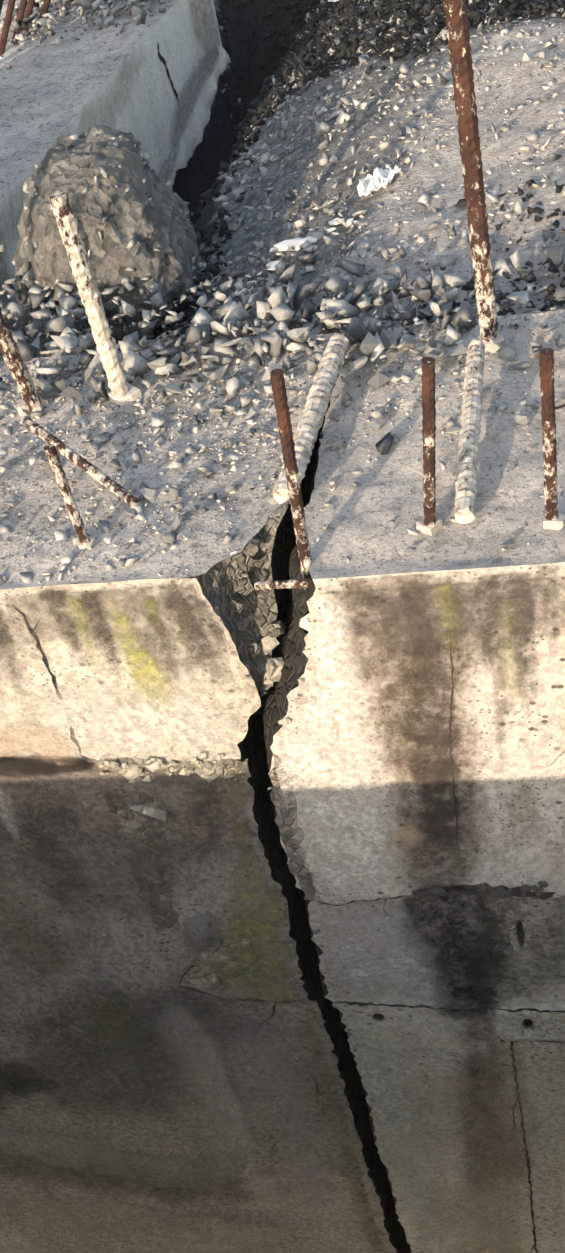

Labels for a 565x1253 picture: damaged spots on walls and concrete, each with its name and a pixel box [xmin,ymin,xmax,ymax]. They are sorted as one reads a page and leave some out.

damp [0,621,12,666]
crack [12,605,81,753]
damp [29,586,218,664]
spalling [196,333,349,697]
crack [180,373,565,1253]
damp [282,572,565,1030]